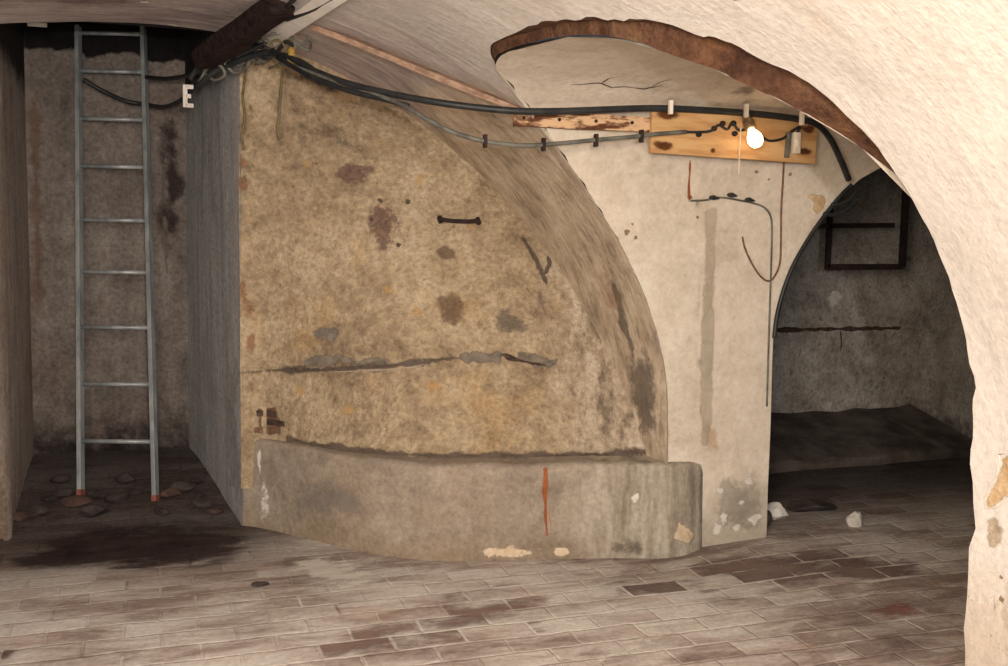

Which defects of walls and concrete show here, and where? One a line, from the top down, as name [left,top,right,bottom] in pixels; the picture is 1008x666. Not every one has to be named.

crack [253,357,455,374]
crack [501,353,546,366]
rust [542,468,551,536]
flaking render [984,453,1008,547]
spalling [483,545,532,558]
spalling [554,548,570,557]